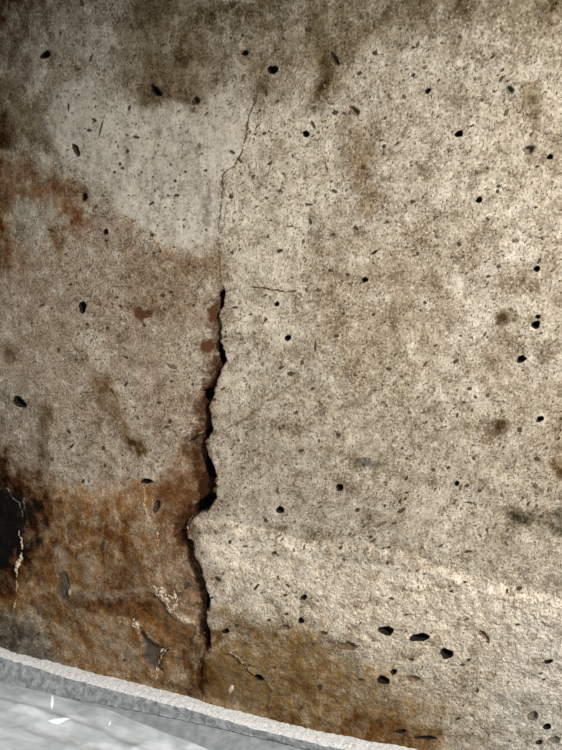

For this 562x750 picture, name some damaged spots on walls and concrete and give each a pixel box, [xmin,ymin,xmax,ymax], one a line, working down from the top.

crack [218,49,302,308]
crack [184,338,227,579]
corrosion [194,355,225,470]
water stain [0,453,49,596]
spalling [93,585,196,679]
corrosion [180,507,210,632]
crack [204,597,212,650]